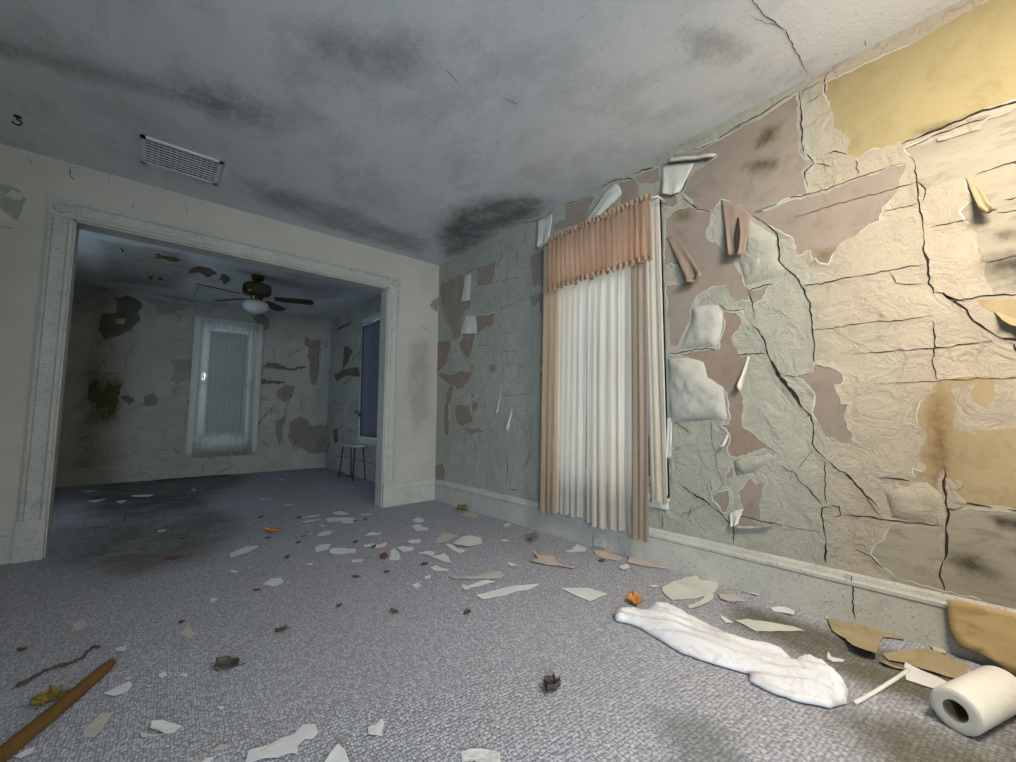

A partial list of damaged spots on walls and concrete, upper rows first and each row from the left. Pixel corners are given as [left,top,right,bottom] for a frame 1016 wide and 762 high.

crack [566,0,1016,619]
peeling [945,478,967,510]